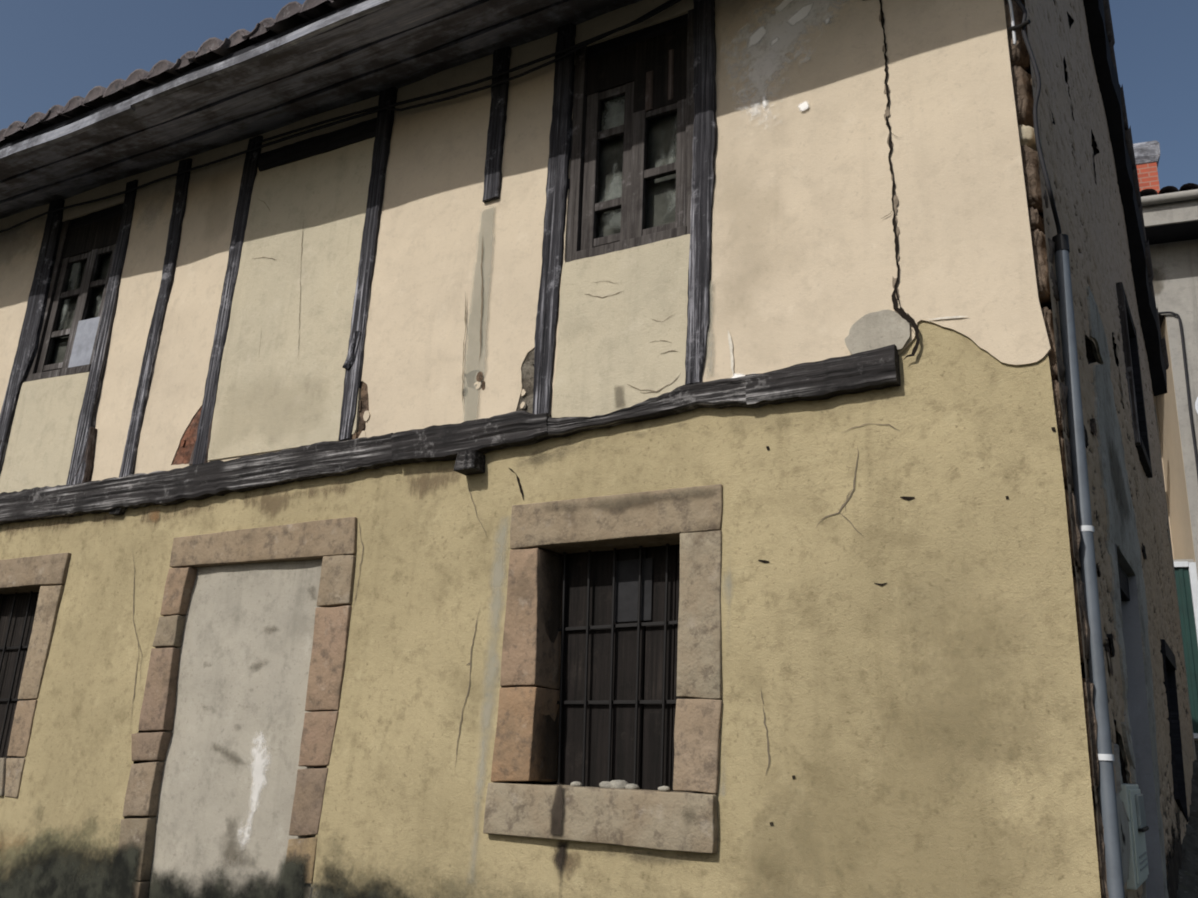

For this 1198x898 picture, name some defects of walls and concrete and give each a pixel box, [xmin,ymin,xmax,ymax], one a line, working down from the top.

crack [879,0,920,360]
spalling [1085,338,1097,365]
spalling [172,407,202,465]
spalling [352,381,370,439]
crack [815,423,898,536]
spalling [1113,722,1136,821]